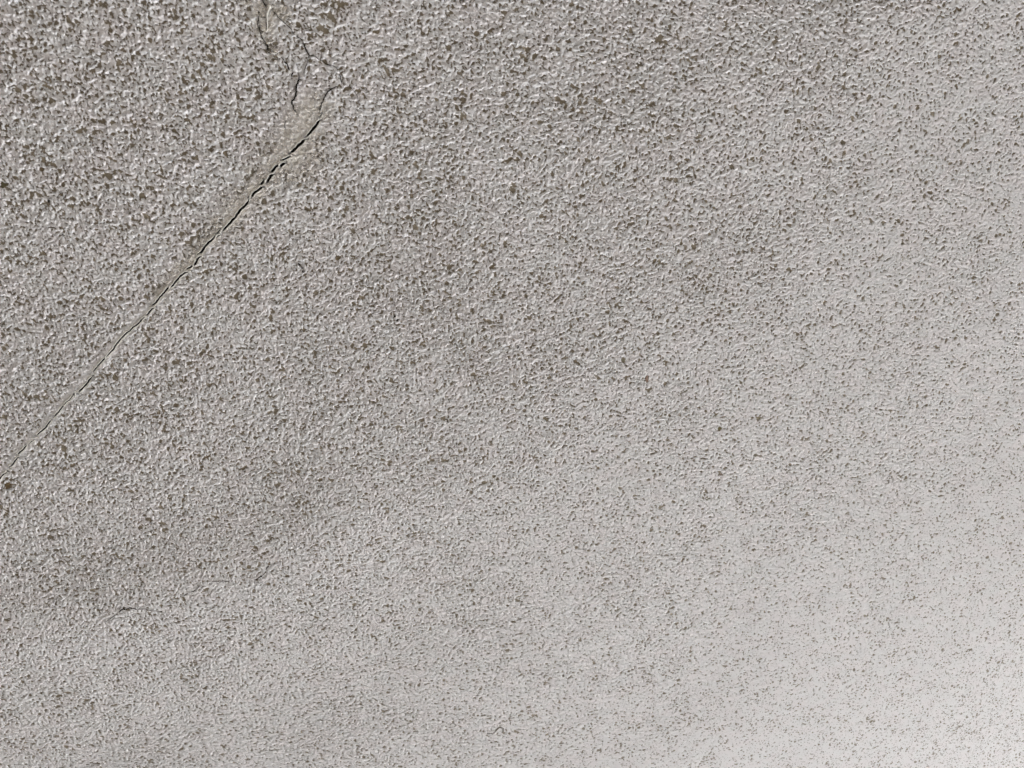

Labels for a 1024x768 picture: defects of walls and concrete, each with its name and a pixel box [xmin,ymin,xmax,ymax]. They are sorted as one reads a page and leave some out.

crack [0,0,358,481]